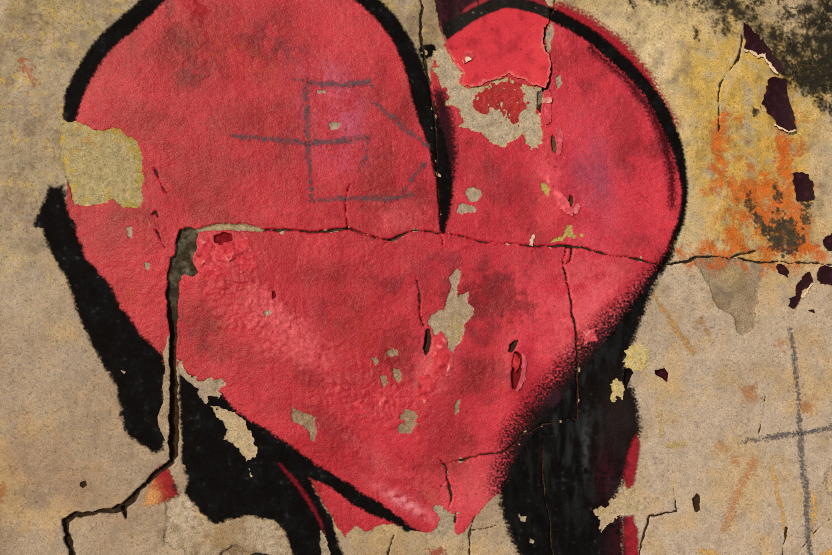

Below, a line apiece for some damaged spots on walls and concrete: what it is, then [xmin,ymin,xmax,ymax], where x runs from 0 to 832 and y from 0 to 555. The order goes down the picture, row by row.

peeling [432,0,562,150]
damp [695,0,832,113]
peeling [743,23,797,132]
peeling [59,120,144,208]
peeling [177,359,258,477]
crack [62,0,488,555]
peeling [415,268,474,405]
hole [623,368,633,389]
crack [440,243,832,555]
corrosion [676,113,826,271]
peeling [792,172,815,202]
peeling [823,233,832,251]